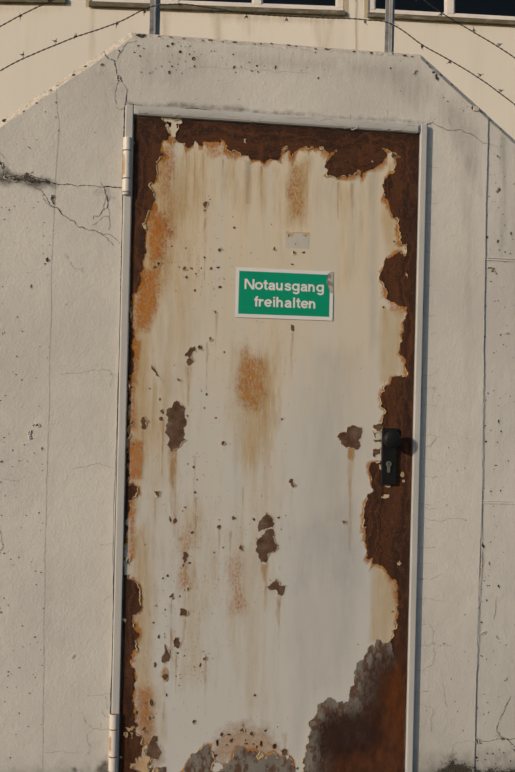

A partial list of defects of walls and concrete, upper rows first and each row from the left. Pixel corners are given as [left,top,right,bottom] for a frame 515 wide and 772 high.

spalling [0,162,55,184]
crack [0,156,121,246]
peeling [159,398,188,452]
rust [110,117,419,772]
crack [452,696,515,750]
water stain [437,759,515,772]